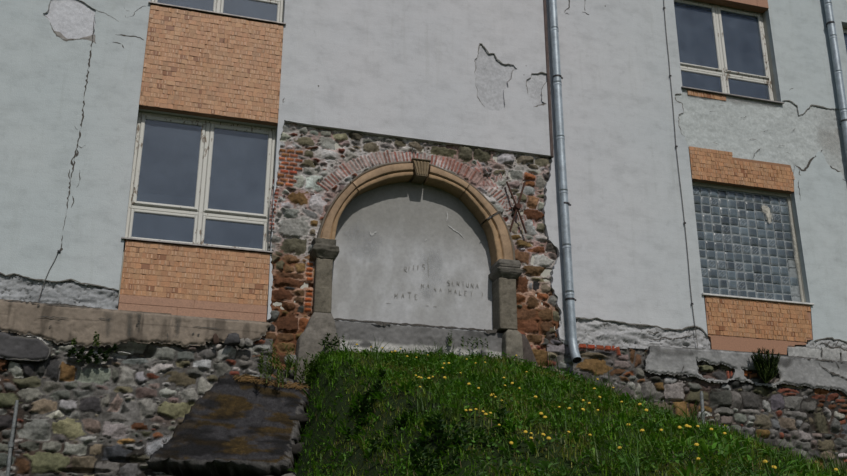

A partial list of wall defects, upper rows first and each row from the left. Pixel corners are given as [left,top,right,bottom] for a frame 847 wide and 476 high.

flaking render [44,0,115,44]
flaking render [475,43,516,111]
flaking render [526,72,547,107]
crack [61,22,95,248]
flaking render [675,89,847,181]
flaking render [265,122,711,378]
flaking render [0,272,119,310]
flaking render [806,337,847,350]